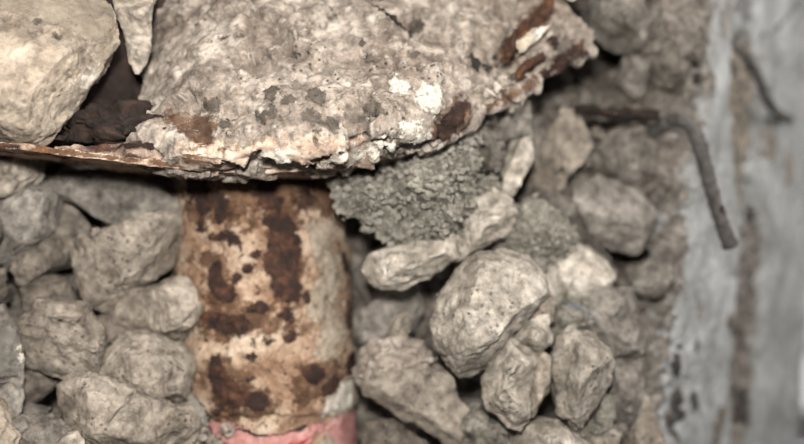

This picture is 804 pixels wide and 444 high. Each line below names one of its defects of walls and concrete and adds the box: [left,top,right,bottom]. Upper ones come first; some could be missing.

spalling [359,38,381,63]
spalling [408,18,426,34]
spalling [468,52,488,72]
corrosion [486,0,590,113]
spalling [203,97,231,128]
spalling [255,85,341,143]
spalling [362,102,388,118]
corrosion [431,90,472,143]
spalling [645,0,794,444]
corrosion [48,106,381,422]
peeling [305,216,349,363]
peeling [208,378,359,444]